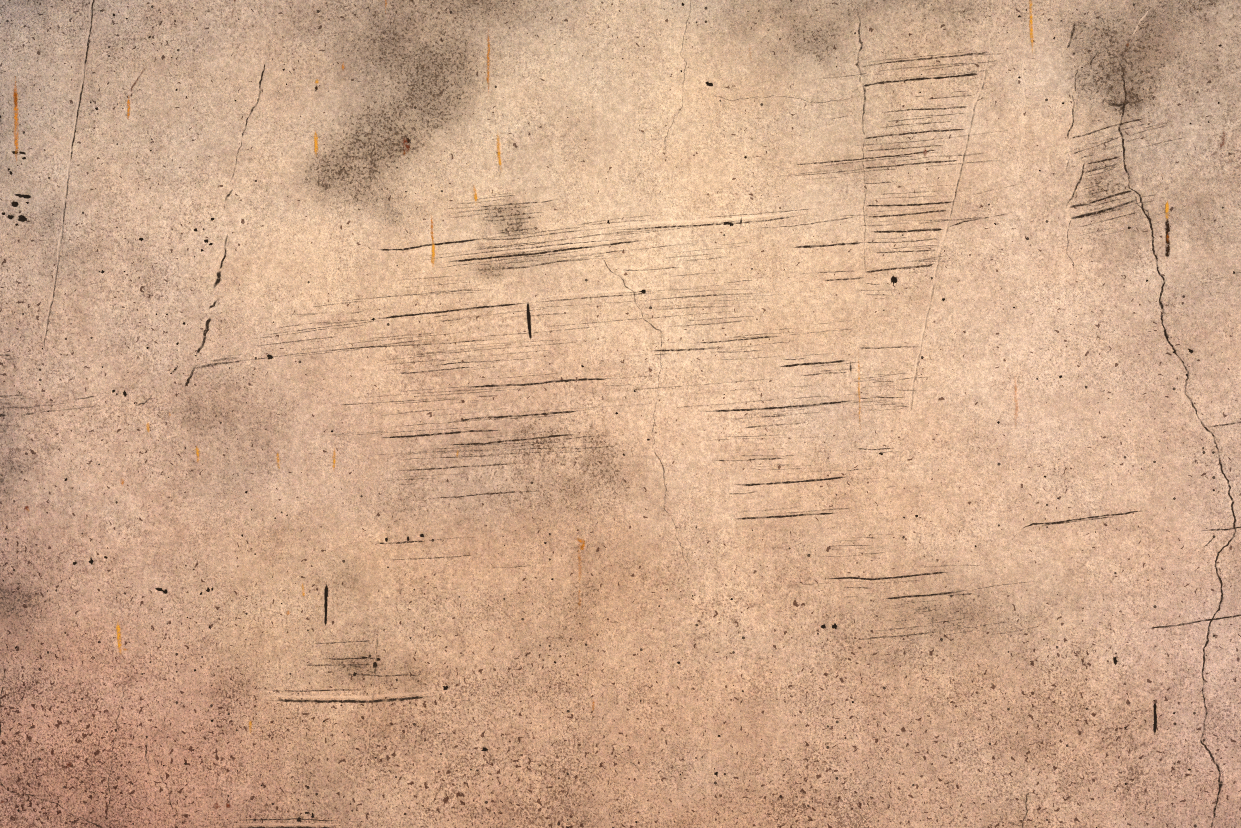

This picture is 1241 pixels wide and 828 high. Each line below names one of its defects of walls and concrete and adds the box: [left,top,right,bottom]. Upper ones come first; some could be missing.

crack [173,242,226,385]
crack [1067,24,1236,827]